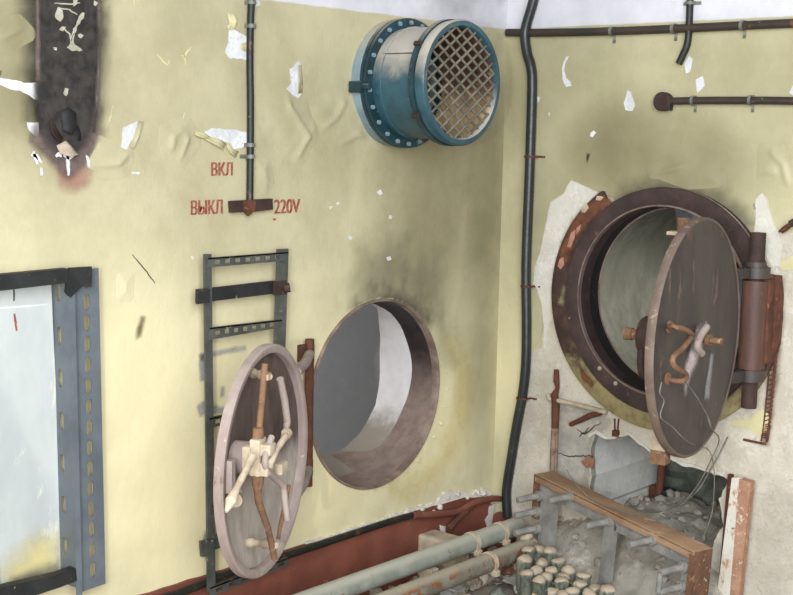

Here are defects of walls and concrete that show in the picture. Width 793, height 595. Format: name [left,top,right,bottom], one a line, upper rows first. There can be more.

peeling [225,13,247,60]
peeling [0,71,35,99]
peeling [286,61,303,98]
peeling [562,56,572,87]
peeling [624,90,635,111]
peeling [121,121,143,150]
peeling [195,128,247,158]
corrosion [558,193,611,269]
peeling [511,180,652,541]
peeling [664,193,793,595]
flaking render [304,488,493,544]